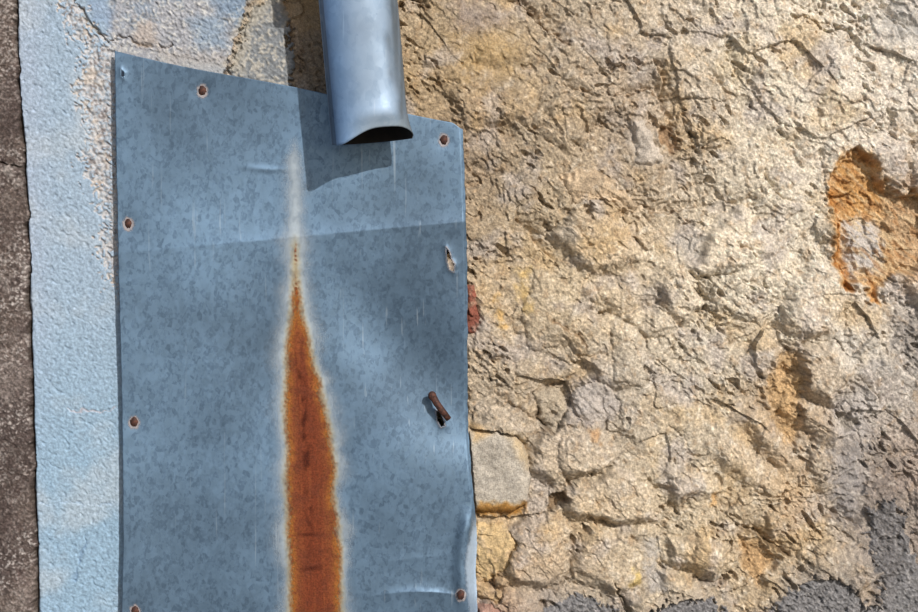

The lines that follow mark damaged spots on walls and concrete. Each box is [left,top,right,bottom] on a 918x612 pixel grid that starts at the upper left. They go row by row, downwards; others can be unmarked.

flaking render [560,167,639,213]
flaking render [632,120,664,167]
flaking render [841,220,884,276]
crack [0,0,117,612]
corrosion [278,152,347,612]
flaking render [533,382,622,434]
spalling [759,347,813,449]
flaking render [468,427,532,606]